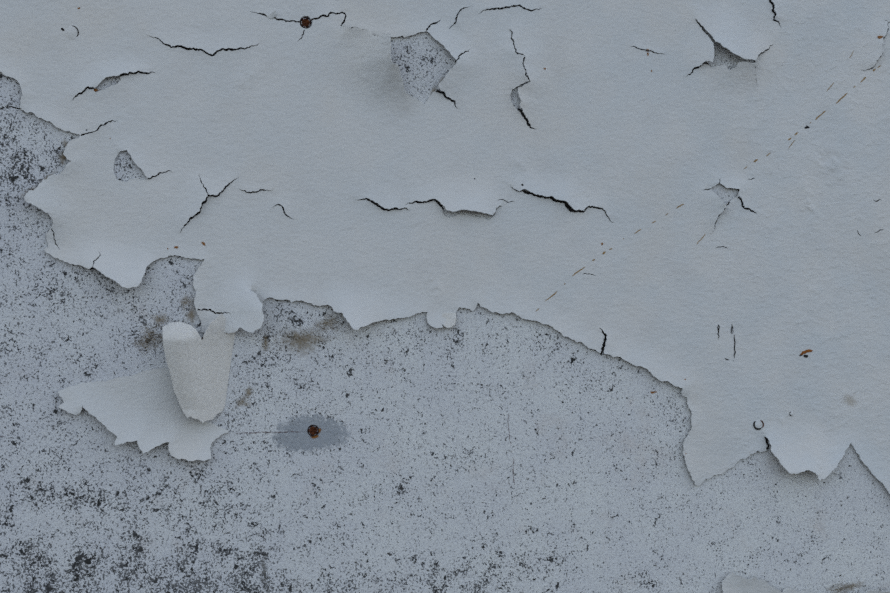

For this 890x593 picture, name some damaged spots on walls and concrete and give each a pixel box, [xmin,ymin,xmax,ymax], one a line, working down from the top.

crack [65,3,346,142]
peeling [331,14,484,119]
crack [449,0,557,134]
peeling [0,56,215,328]
crack [170,170,296,234]
crack [351,170,617,223]
peeling [201,271,264,333]
peeling [257,276,447,330]
peeling [447,285,605,353]
peeling [58,313,235,462]
peeling [611,337,767,486]
peeling [756,420,849,481]